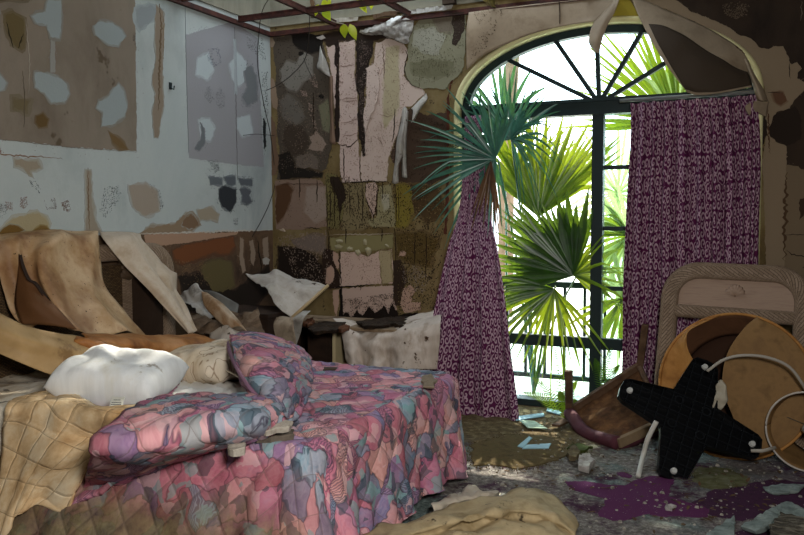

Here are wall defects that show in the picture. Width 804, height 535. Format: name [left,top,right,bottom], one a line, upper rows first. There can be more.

peeling [0,0,147,160]
damp [173,10,454,319]
flaking render [270,9,468,229]
peeling [632,0,804,170]
flaking render [325,251,421,317]